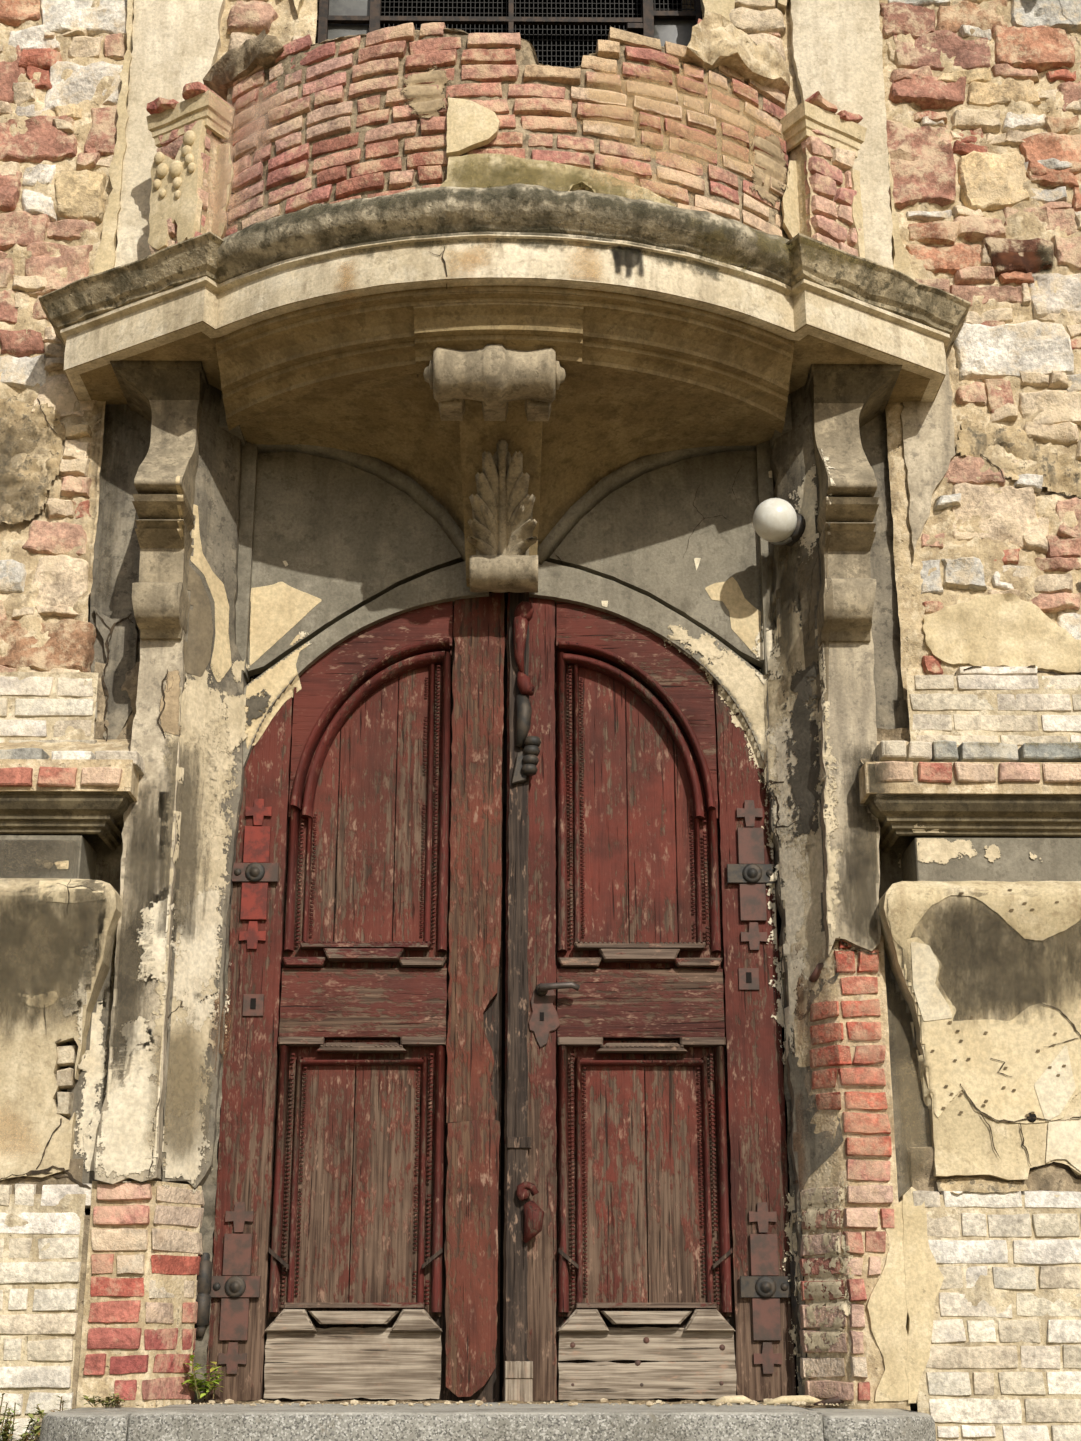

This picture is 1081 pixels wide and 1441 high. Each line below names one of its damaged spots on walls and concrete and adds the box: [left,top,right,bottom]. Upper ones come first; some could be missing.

damp [341,223,719,280]
damp [96,413,117,498]
peeling [661,449,880,1065]
peeling [20,476,322,1193]
peeling [912,824,1001,865]
damp [0,789,163,1078]
damp [927,901,1081,1021]
crack [0,1165,91,1189]
peeling [903,937,1081,1195]
crack [960,1084,1081,1165]
crack [1041,1003,1081,1047]
spalling [780,1179,858,1391]